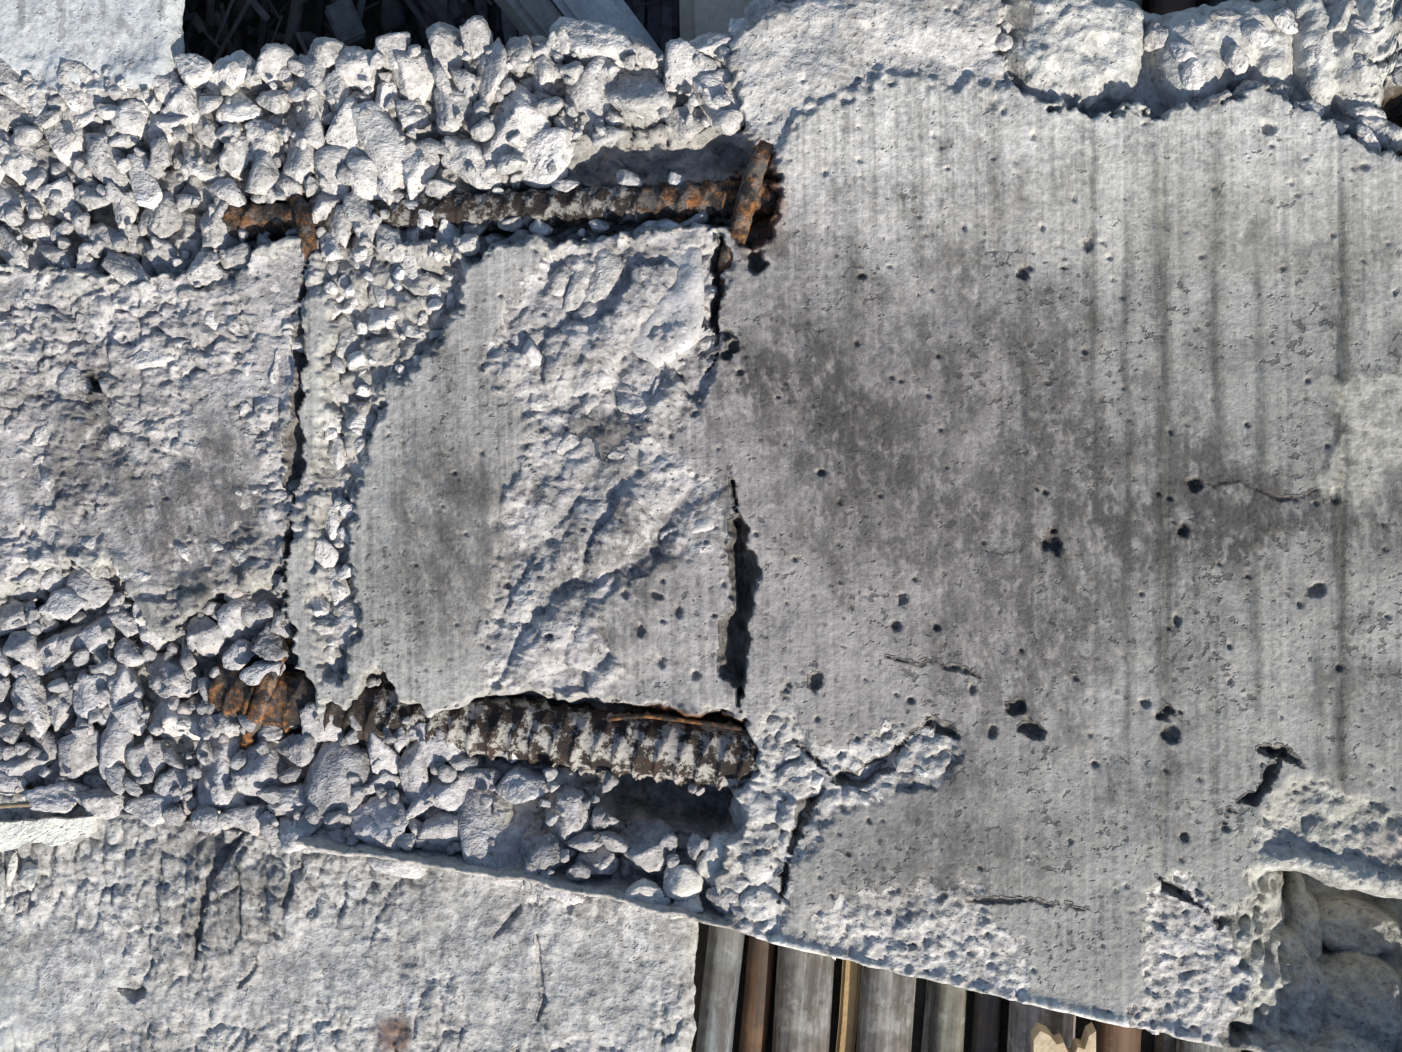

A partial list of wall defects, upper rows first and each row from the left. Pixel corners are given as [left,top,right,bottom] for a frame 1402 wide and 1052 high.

spalling [728,0,1402,156]
corrosion [1381,85,1402,128]
corrosion [750,166,782,244]
crack [280,254,309,670]
spalling [0,15,963,942]
crack [715,478,762,727]
corrosion [634,706,744,723]
crack [776,715,960,905]
spalling [1129,779,1402,1052]